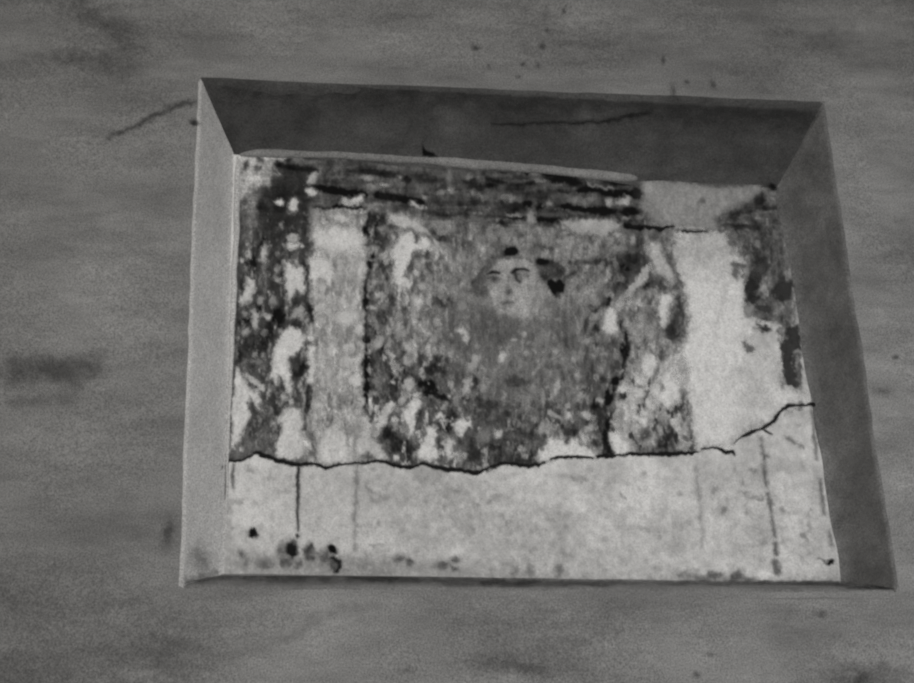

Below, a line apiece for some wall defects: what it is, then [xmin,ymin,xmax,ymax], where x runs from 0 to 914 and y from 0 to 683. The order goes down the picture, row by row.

peeling [567,181,630,207]
peeling [506,211,537,244]
peeling [231,169,487,465]
peeling [498,331,565,395]
peeling [556,213,808,455]
peeling [477,426,502,444]
peeling [537,402,597,462]
crack [225,402,816,538]
crack [773,543,781,574]